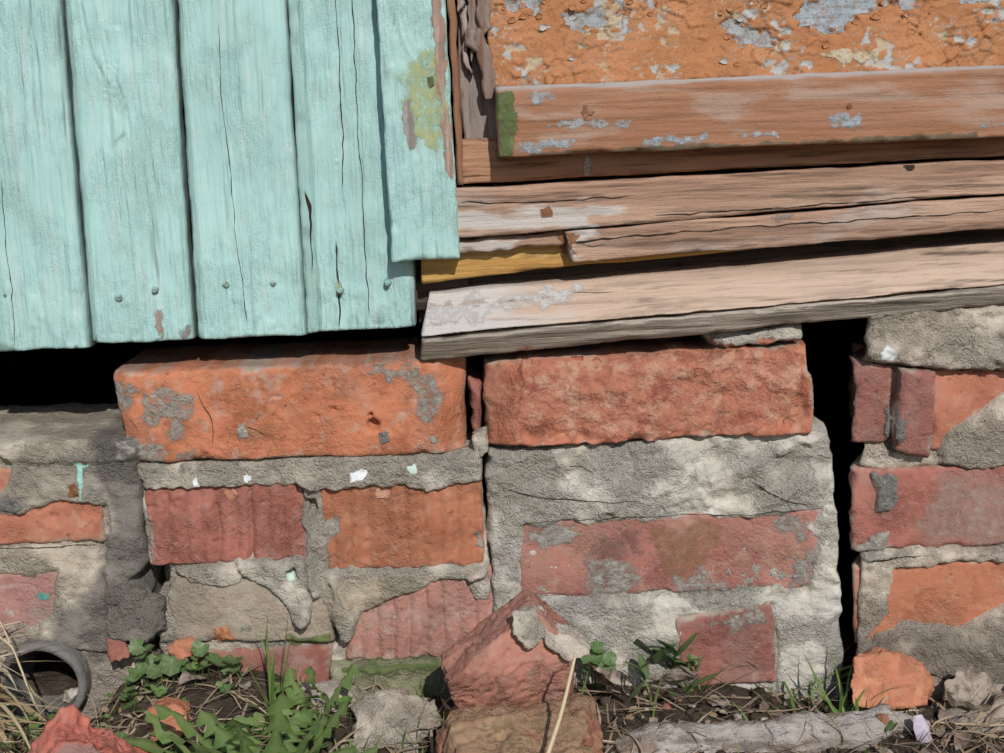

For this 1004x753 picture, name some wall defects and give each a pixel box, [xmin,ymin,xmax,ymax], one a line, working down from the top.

peeling [502,0,633,34]
peeling [717,0,777,49]
peeling [793,0,933,67]
peeling [530,91,555,104]
crack [335,0,370,312]
peeling [519,118,631,153]
peeling [643,132,707,146]
peeling [828,112,862,128]
crack [304,191,342,326]